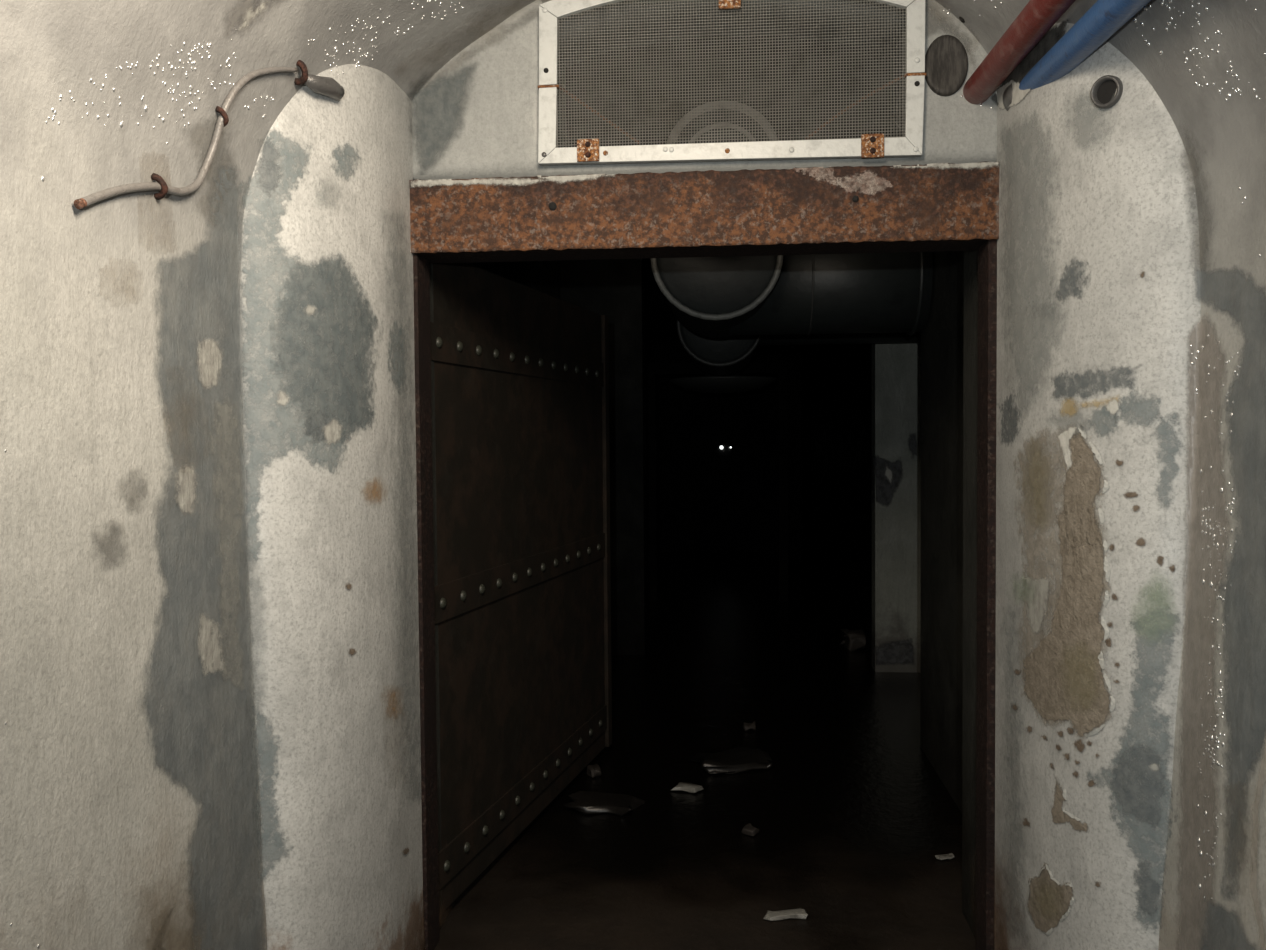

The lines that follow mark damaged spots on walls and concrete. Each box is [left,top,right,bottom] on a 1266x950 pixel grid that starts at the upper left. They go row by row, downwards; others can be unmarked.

water stain [145,130,422,950]
peeling [1027,863,1075,936]
peeling [1013,426,1123,831]
water stain [999,120,1266,950]